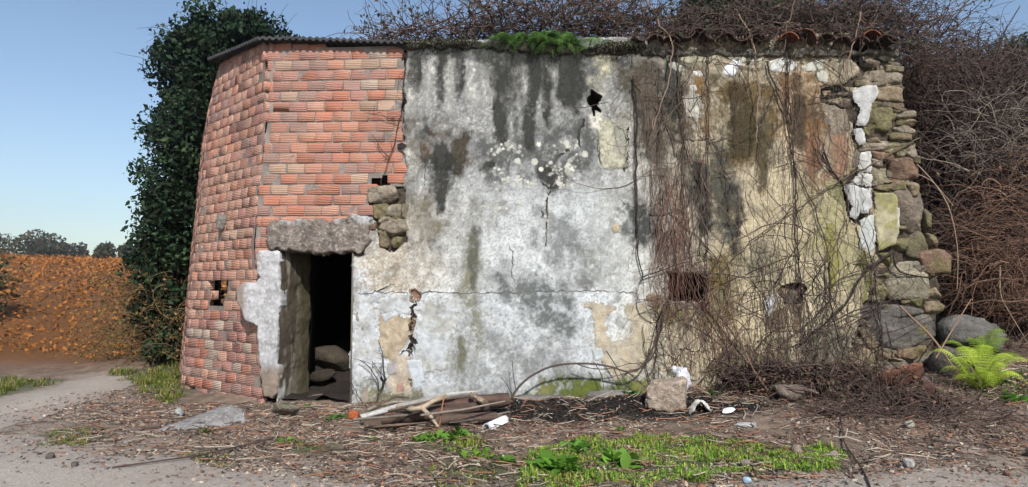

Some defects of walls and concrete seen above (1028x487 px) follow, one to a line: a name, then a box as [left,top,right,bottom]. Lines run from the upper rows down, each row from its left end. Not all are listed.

damp [403,39,783,275]
peeling [352,288,459,402]
crack [358,247,634,393]
peeling [584,287,714,382]